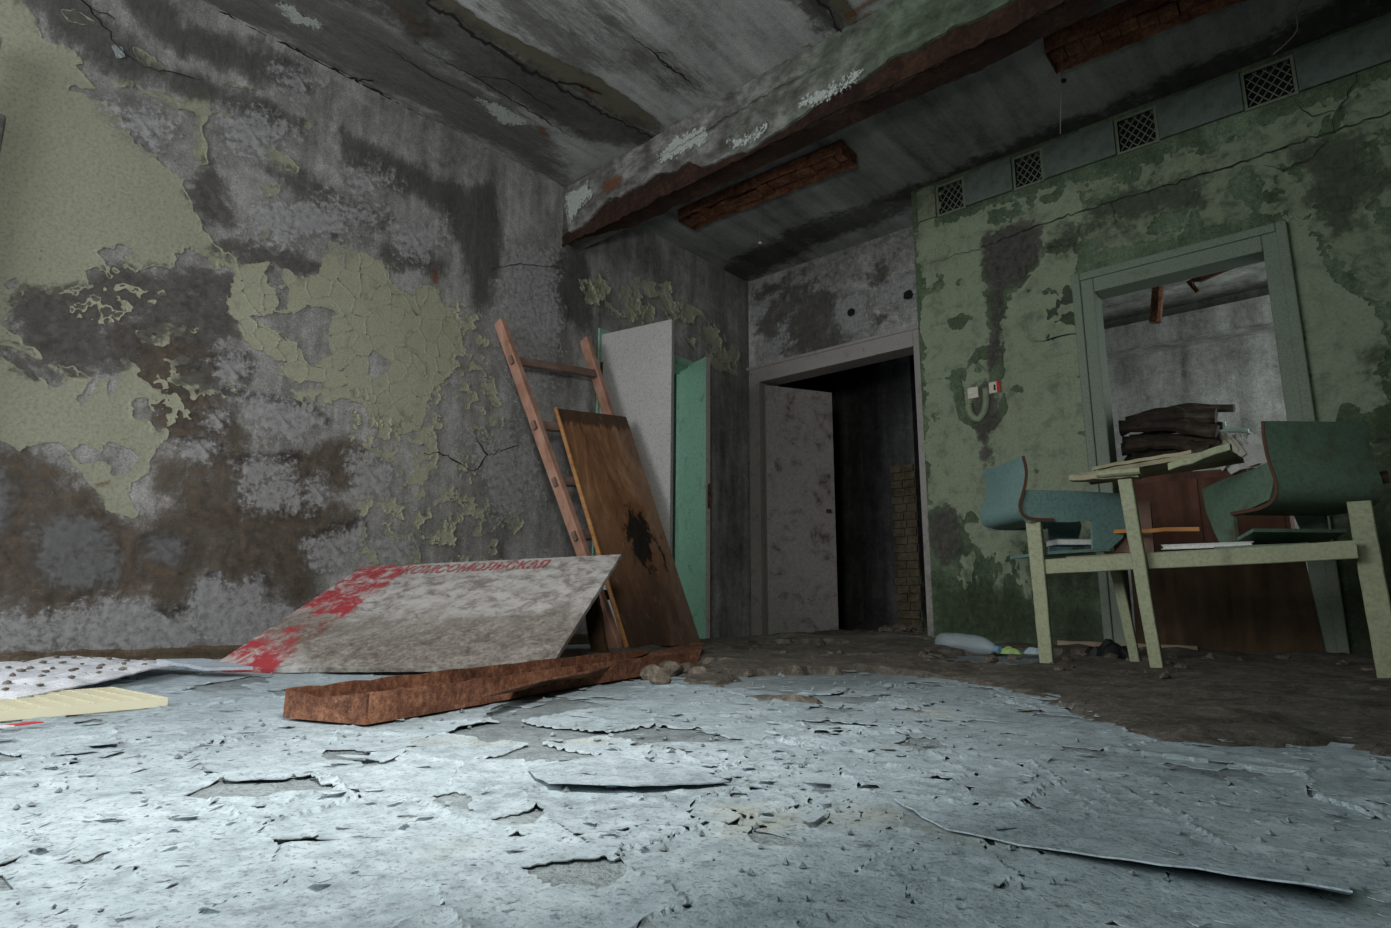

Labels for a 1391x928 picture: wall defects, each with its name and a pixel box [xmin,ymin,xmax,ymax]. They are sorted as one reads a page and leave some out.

crack [219,11,424,117]
leakage [332,0,655,147]
crack [384,0,816,168]
crack [816,0,842,33]
spalling [562,0,1099,247]
leakage [723,0,1391,358]
peeling [0,0,529,565]
leakage [0,0,594,653]
peeling [579,270,742,378]
leakage [926,507,1104,645]
leakage [1373,488,1391,604]
peeling [0,659,1391,928]